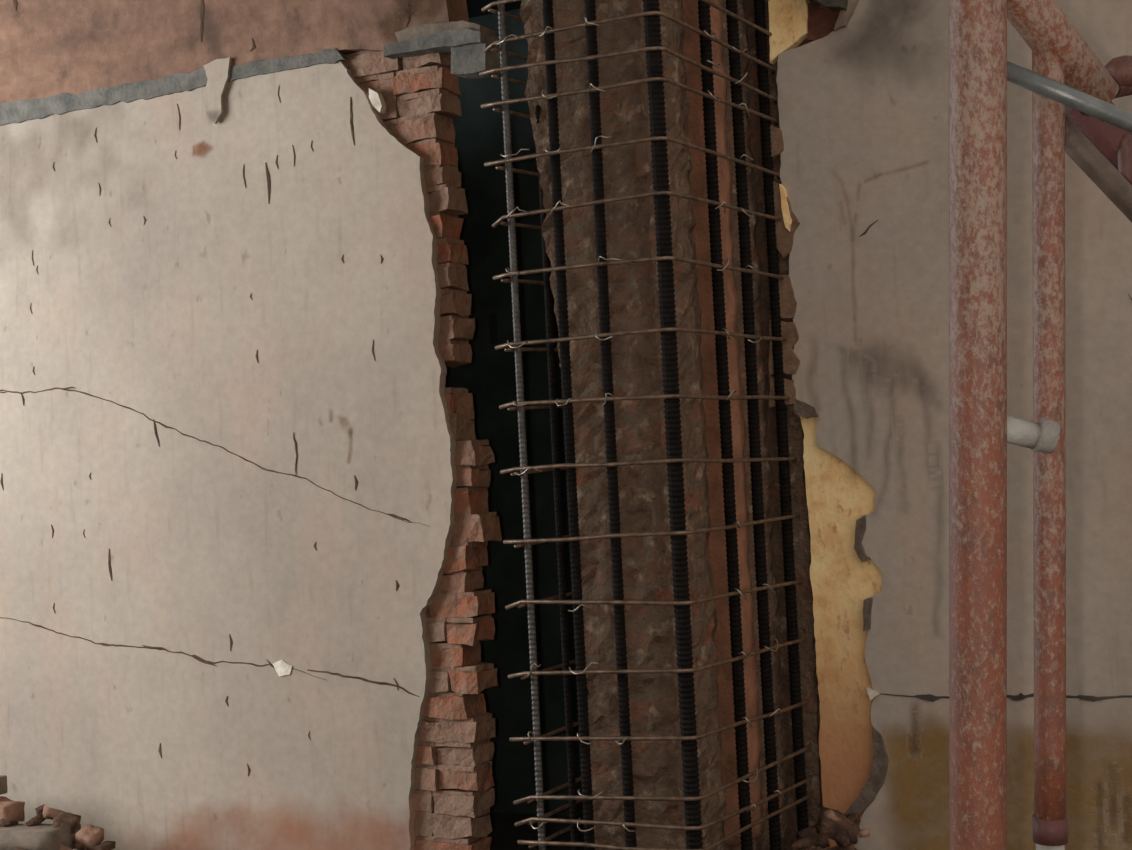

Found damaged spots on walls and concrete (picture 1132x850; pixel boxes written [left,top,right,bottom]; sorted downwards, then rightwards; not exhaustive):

peeling [768,0,840,64]
flaking render [369,89,386,114]
flaking render [770,125,784,163]
flaking render [773,181,800,258]
crack [0,387,430,527]
peeling [769,275,889,820]
crack [0,617,419,697]
crack [883,694,949,702]
crack [1007,693,1034,701]
crack [1066,694,1132,702]
leakage [889,728,949,850]
leakage [1065,736,1132,850]